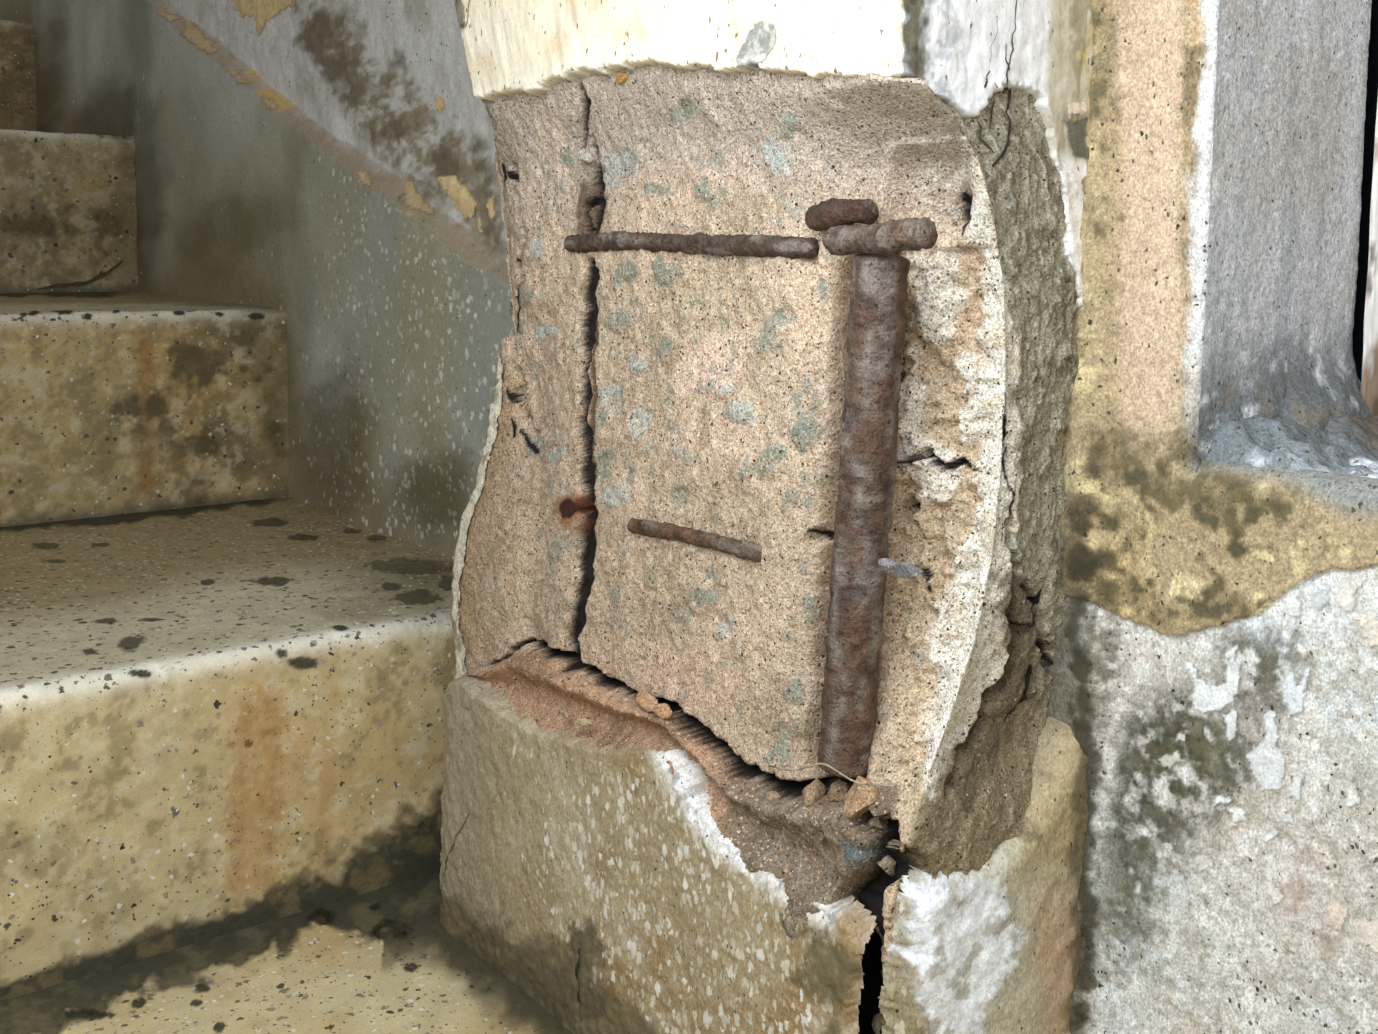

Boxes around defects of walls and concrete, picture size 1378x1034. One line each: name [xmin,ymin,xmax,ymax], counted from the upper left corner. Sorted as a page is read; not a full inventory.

peeling [233,0,296,35]
water stain [297,9,500,247]
spalling [455,0,465,28]
crack [977,0,1017,167]
corrosion [559,497,598,535]
crack [497,86,856,797]
spalling [437,21,1090,1034]
crack [897,392,1015,516]
water stain [1065,508,1153,1029]
water stain [1114,695,1248,870]
water stain [0,790,652,1034]
crack [857,814,915,1034]